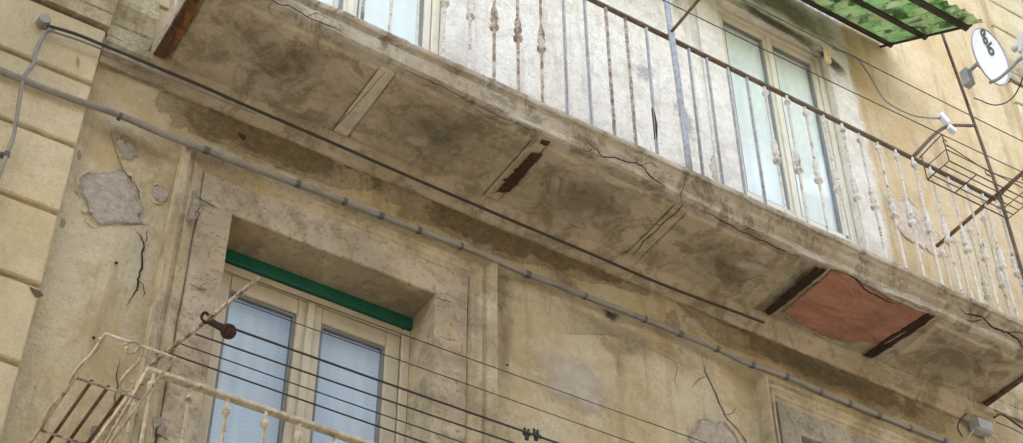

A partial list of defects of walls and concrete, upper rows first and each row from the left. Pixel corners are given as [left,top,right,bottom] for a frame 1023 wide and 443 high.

crack [110,128,131,180]
peeling [75,136,169,228]
crack [582,138,799,257]
crack [126,228,148,306]
flaking render [774,247,931,344]
crack [959,308,1023,349]
crack [674,358,747,443]
peeling [686,419,740,443]